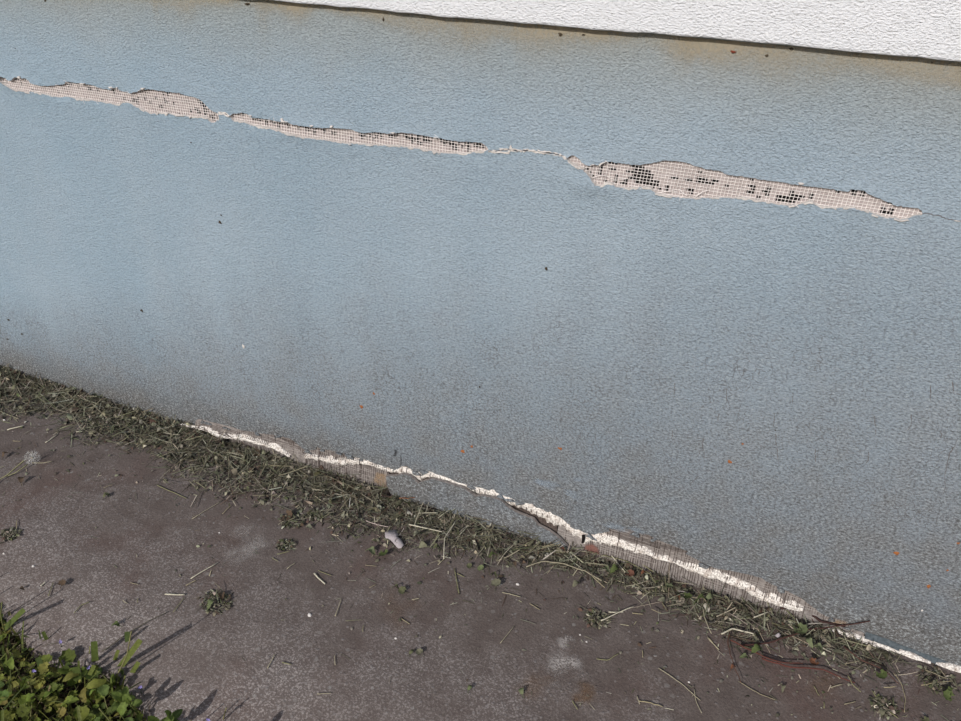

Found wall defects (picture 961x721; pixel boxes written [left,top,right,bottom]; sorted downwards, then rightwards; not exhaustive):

flaking render [0,76,488,155]
flaking render [568,155,922,222]
flaking render [180,419,949,664]